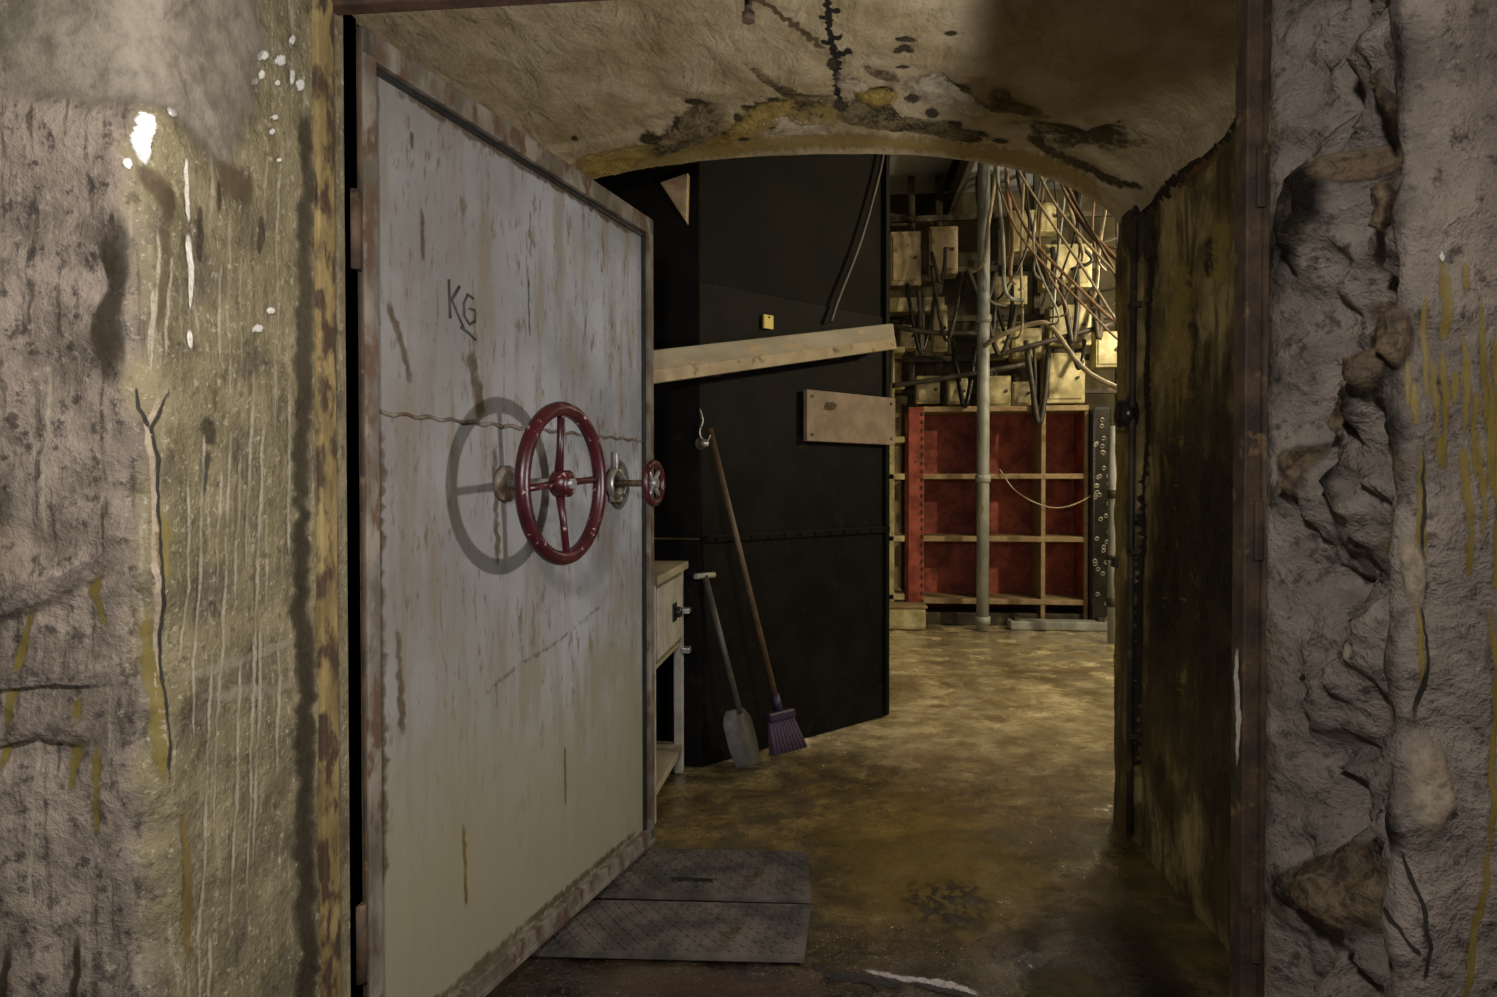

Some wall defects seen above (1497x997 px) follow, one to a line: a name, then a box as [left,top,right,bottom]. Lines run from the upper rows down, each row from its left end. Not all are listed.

spalling [572,36,1048,179]
leakage [148,160,194,366]
crack [135,388,172,774]
leakage [181,405,264,729]
leakage [197,882,212,997]